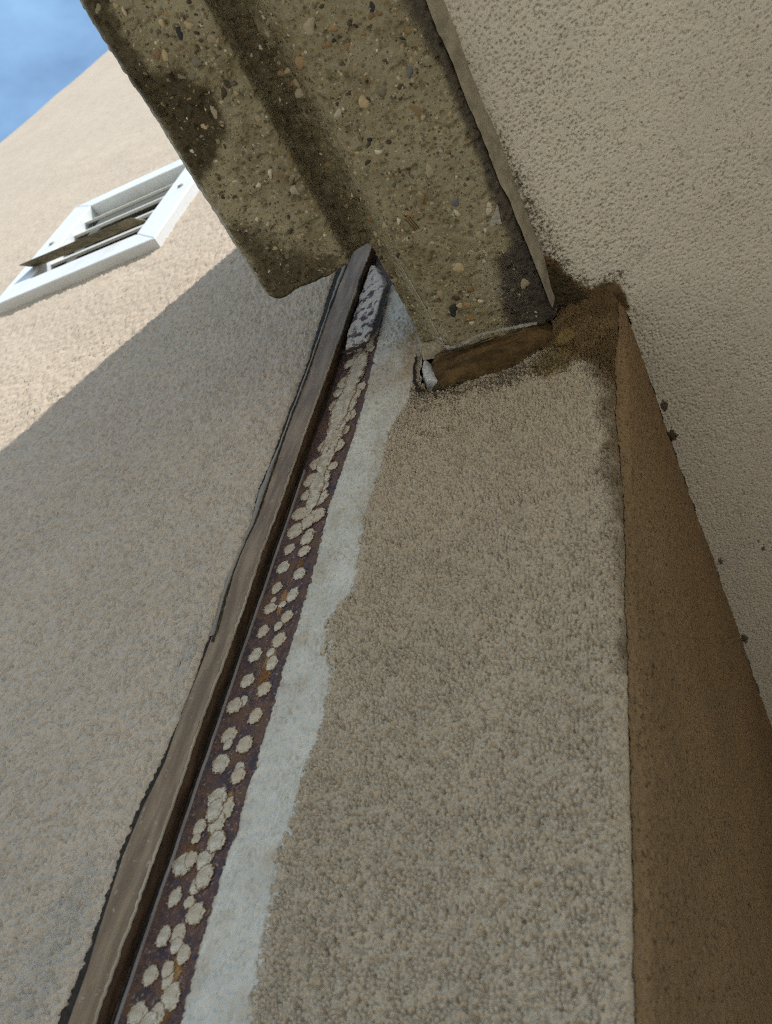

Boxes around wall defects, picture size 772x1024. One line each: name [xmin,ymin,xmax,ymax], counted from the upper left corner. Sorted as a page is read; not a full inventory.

water stain [407,0,631,410]
corrosion [255,645,278,699]
peeling [181,265,553,1024]